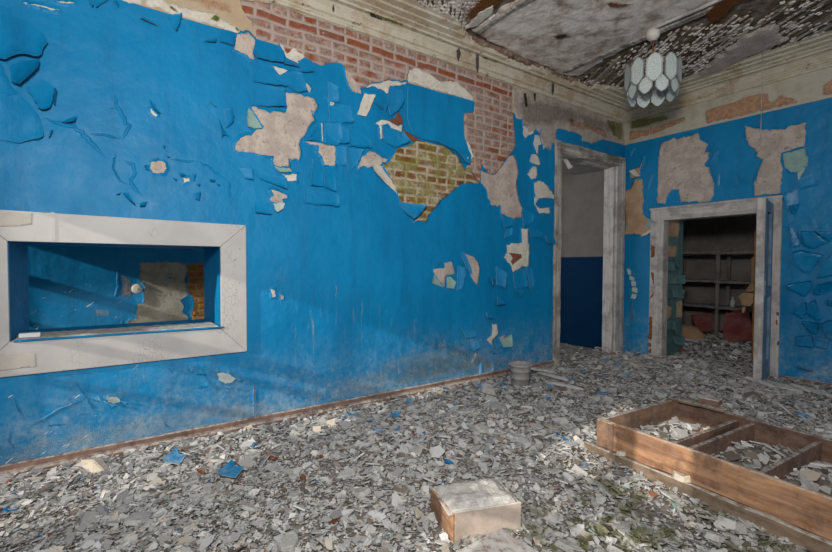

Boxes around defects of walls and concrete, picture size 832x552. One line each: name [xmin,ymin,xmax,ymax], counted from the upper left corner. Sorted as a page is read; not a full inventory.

flaking render [21,0,78,15]
flaking render [89,0,624,305]
flaking render [625,131,722,258]
flaking render [742,121,818,209]
flaking render [124,259,204,324]
flaking render [626,267,639,301]
peeling [667,220,686,346]
flaking render [462,313,513,364]